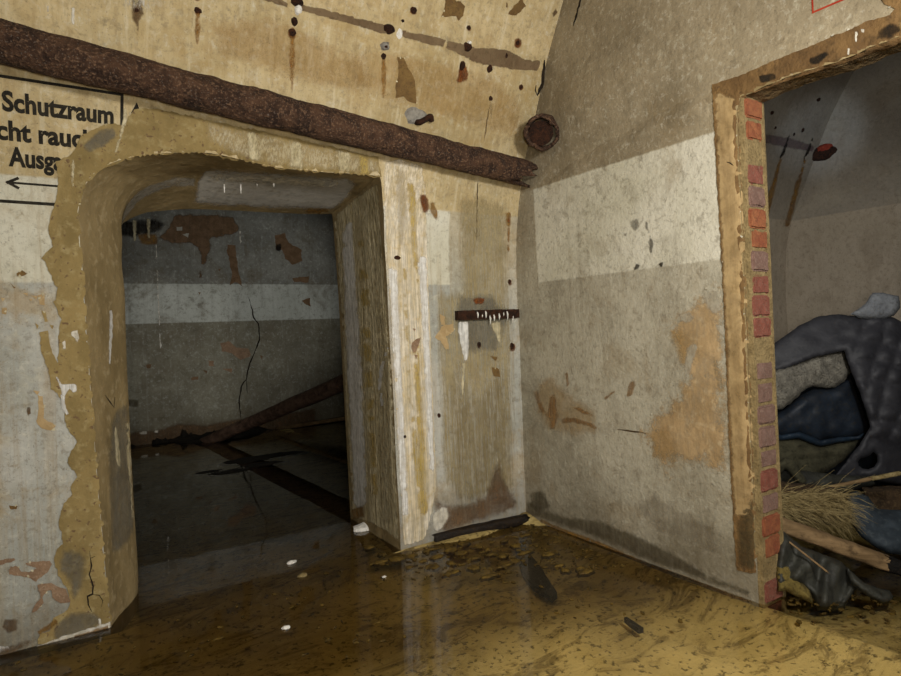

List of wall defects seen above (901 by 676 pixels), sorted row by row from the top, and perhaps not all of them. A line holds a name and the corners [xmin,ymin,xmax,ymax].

peeling [441,0,465,21]
peeling [506,0,526,15]
peeling [395,57,417,104]
spalling [640,0,901,573]
peeling [0,108,382,645]
crack [238,299,260,417]